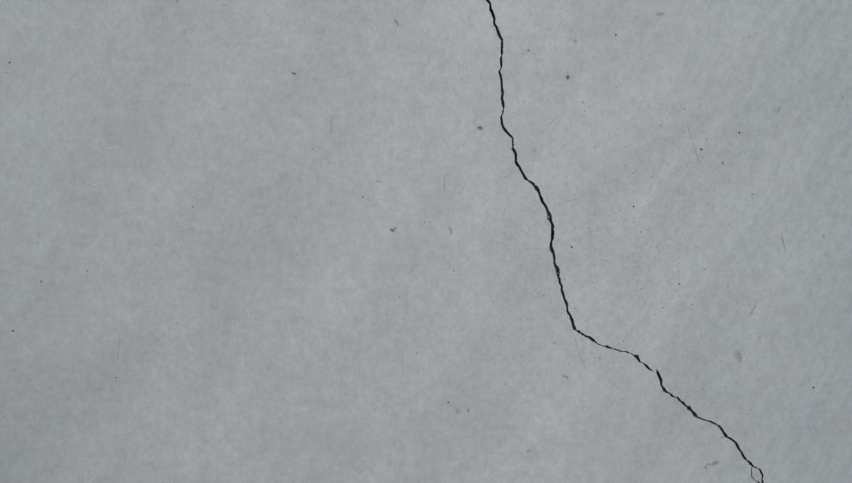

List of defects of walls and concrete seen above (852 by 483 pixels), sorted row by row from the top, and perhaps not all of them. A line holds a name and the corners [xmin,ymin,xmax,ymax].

crack [486,0,764,483]